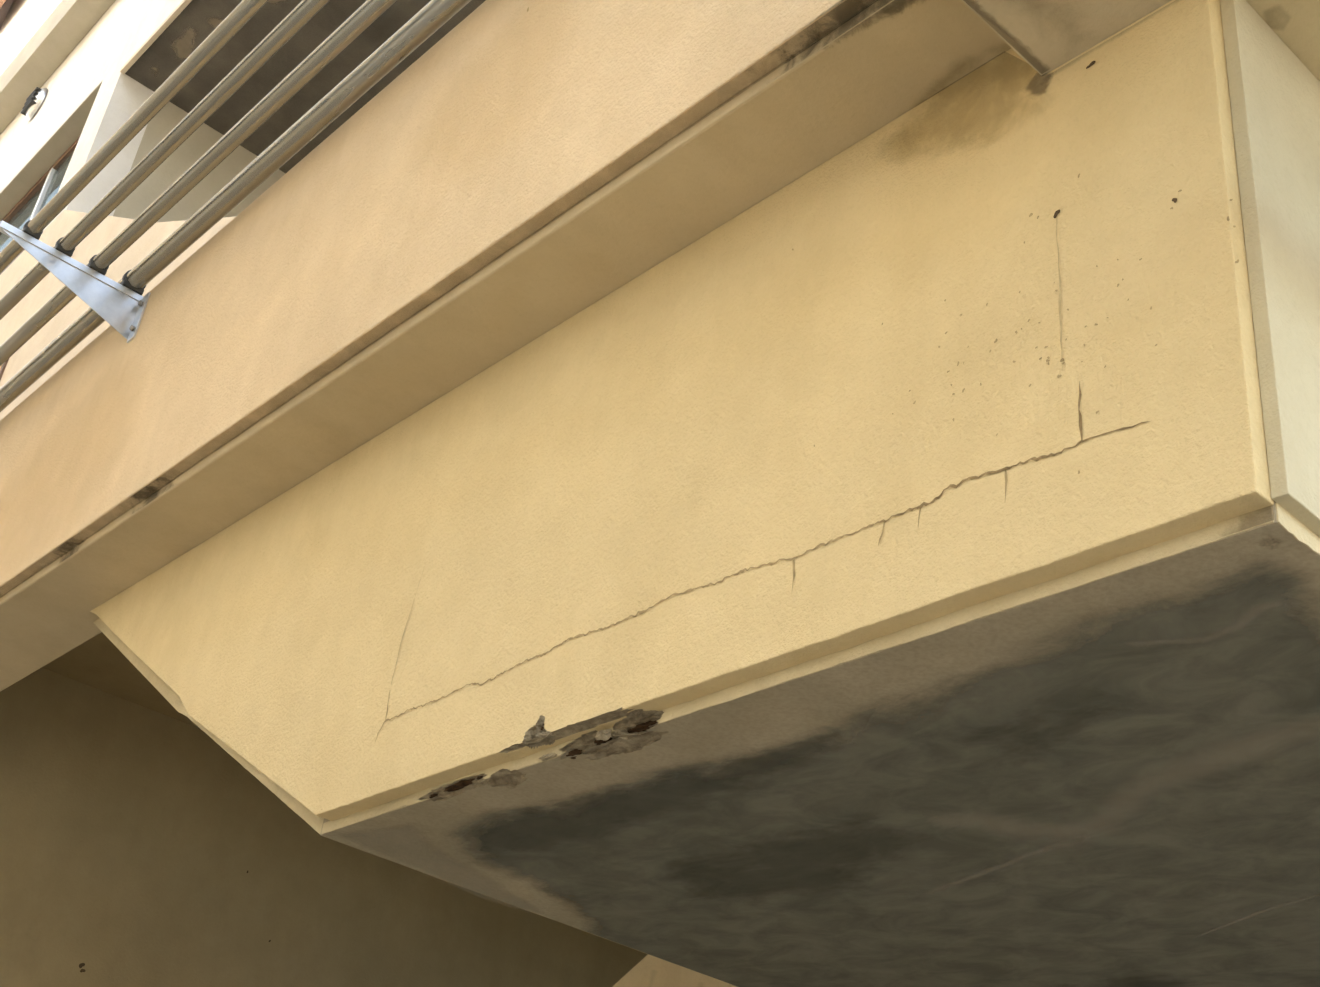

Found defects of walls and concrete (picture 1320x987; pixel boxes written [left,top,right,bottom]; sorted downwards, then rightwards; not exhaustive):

crack [1053,209,1062,353]
crack [375,382,1150,741]
spalling [397,769,527,809]
spalling [499,707,669,761]
damp [466,574,1320,987]